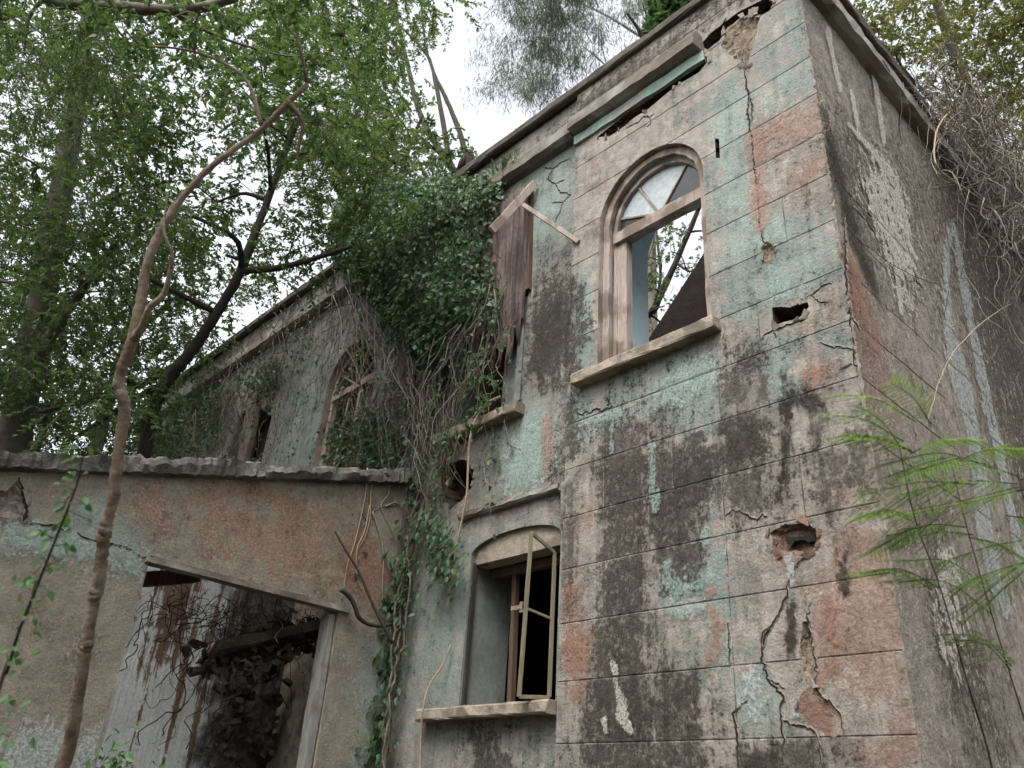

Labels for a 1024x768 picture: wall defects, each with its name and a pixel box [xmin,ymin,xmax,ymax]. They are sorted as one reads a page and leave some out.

crack [544,158,571,223]
spalling [703,0,776,75]
crack [741,56,765,242]
water stain [825,27,888,170]
water stain [818,102,903,315]
spalling [760,242,810,331]
crack [763,205,923,371]
hole [441,457,477,510]
water stain [524,275,883,768]
spalling [765,514,822,585]
crack [731,558,845,768]
spalling [791,617,844,738]